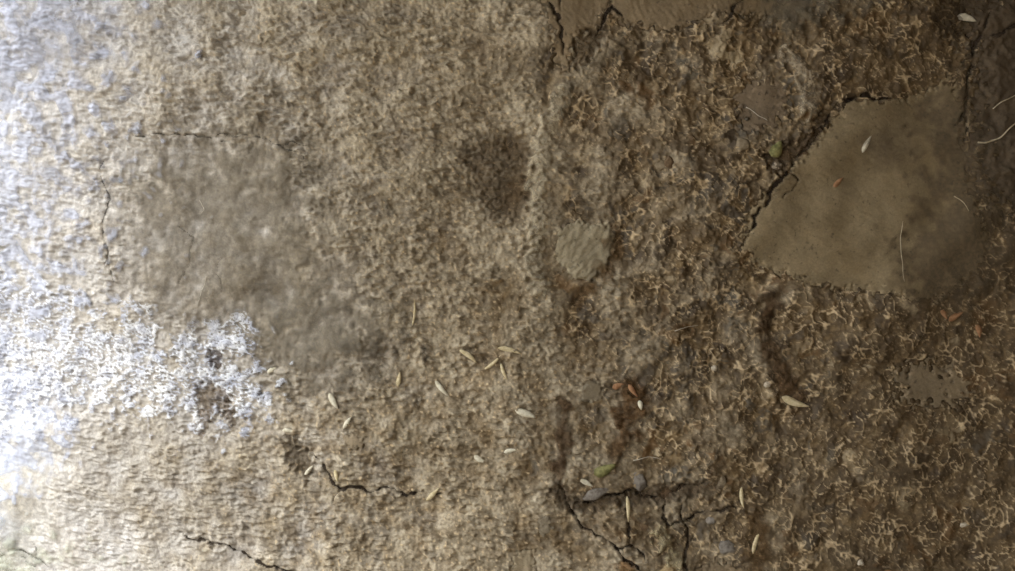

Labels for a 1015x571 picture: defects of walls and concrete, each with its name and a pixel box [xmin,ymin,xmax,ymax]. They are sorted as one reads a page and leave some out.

spalling [573,29,603,71]
spalling [764,110,828,175]
water stain [0,127,387,504]
peeling [459,350,507,379]
peeling [515,408,536,418]
crack [560,482,734,571]
crack [1,546,46,567]
crack [185,536,288,571]